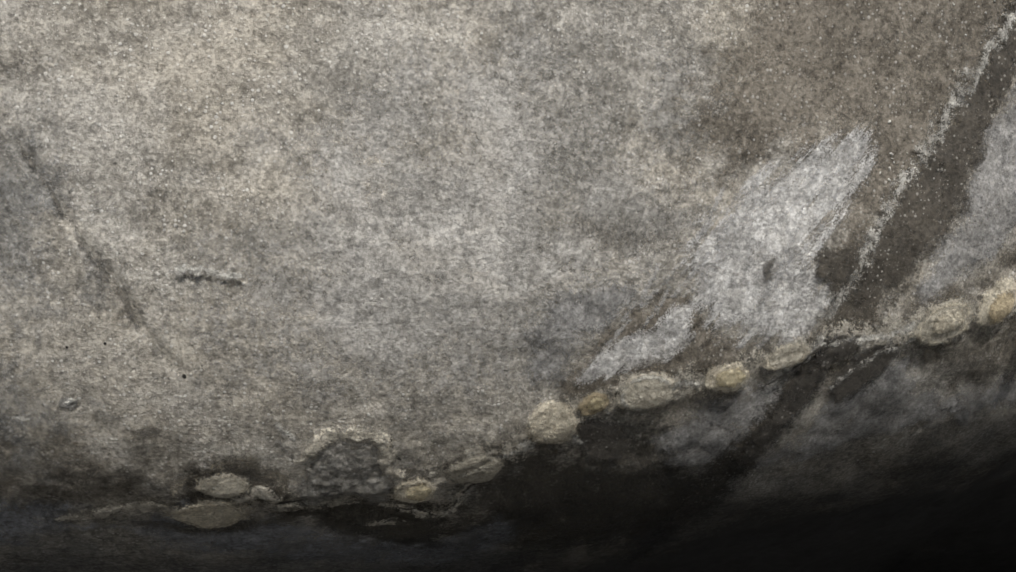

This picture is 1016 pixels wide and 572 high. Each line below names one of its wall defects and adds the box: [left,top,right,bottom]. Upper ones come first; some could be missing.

water stain [577,168,684,260]
water stain [0,423,142,547]